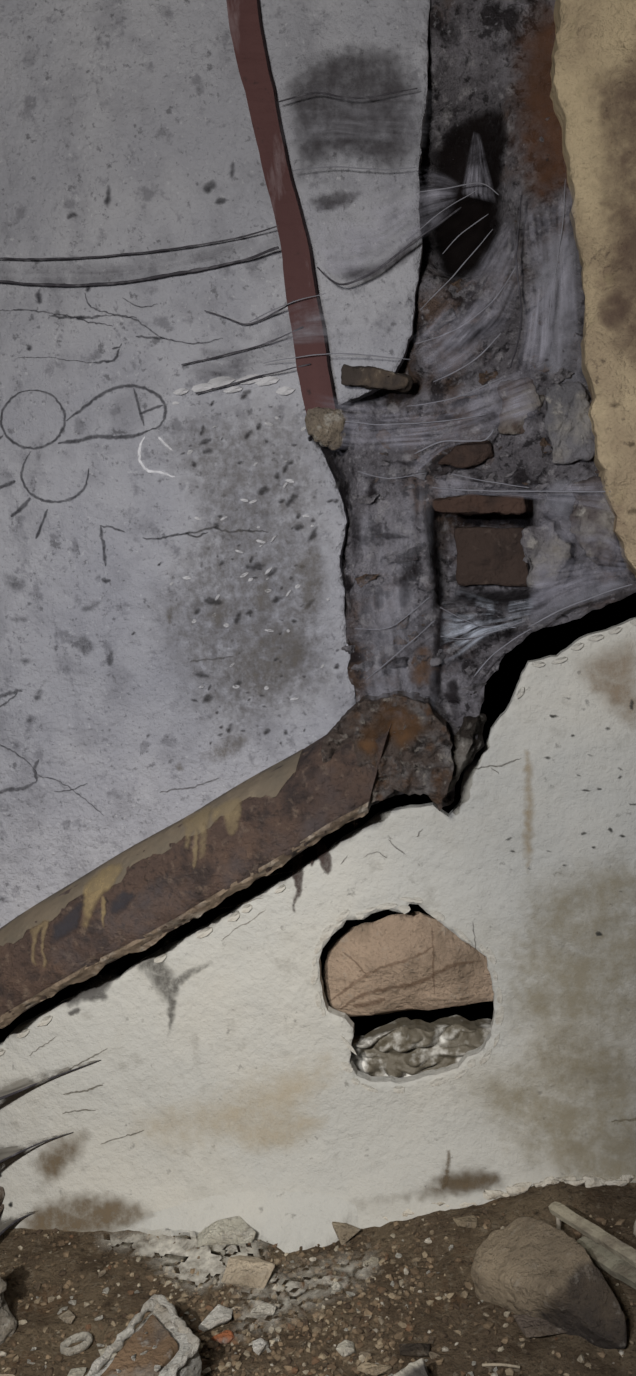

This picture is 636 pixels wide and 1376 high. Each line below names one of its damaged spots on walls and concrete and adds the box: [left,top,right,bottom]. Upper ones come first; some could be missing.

spalling [172,374,296,406]
spalling [235,427,316,602]
spalling [192,594,252,627]
peeling [531,618,636,667]
crack [0,689,22,707]
crack [0,745,97,810]
rust [84,866,119,924]
rust [291,841,331,910]
peeling [311,897,504,1093]
damp [431,1154,636,1207]